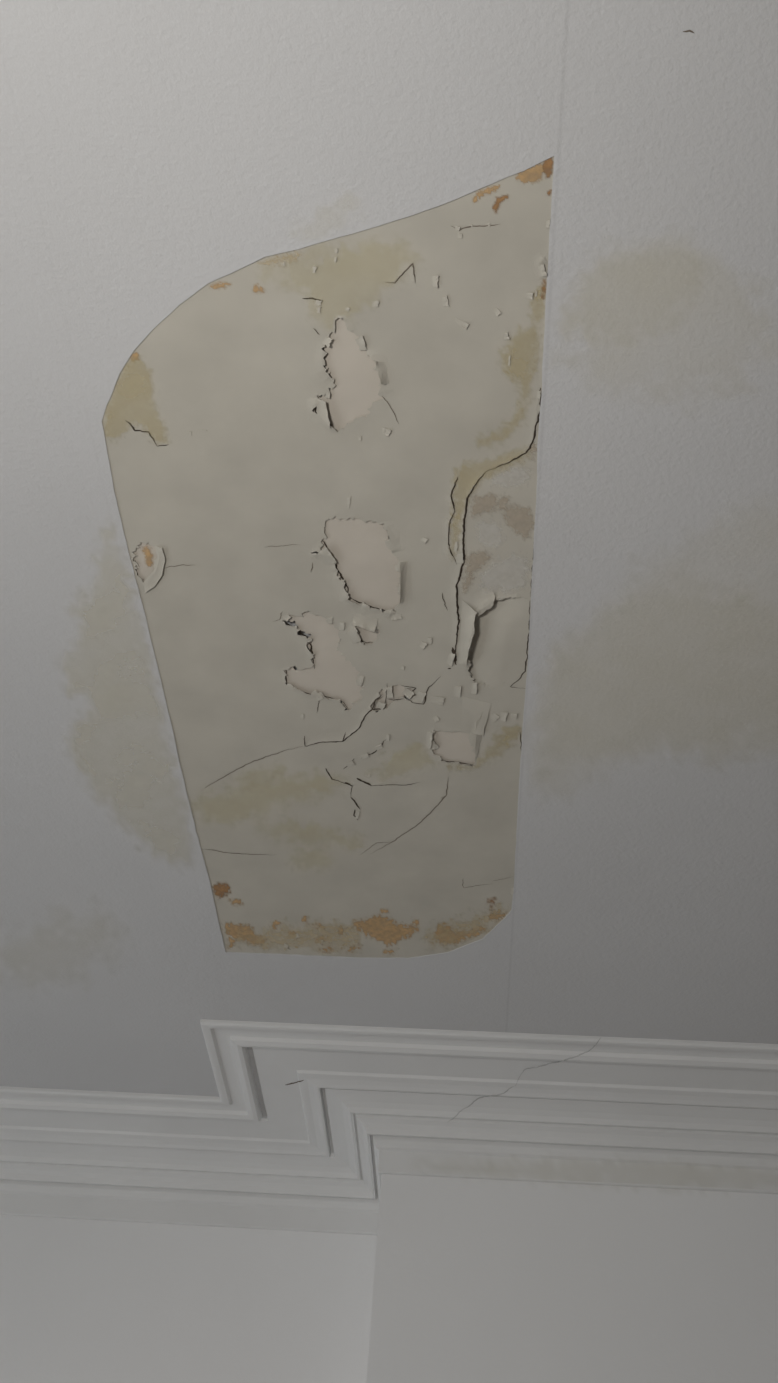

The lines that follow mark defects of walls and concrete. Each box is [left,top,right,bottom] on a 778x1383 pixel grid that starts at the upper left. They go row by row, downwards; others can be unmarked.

peeling [102,156,554,958]
crack [205,388,541,855]
crack [448,1038,601,1122]